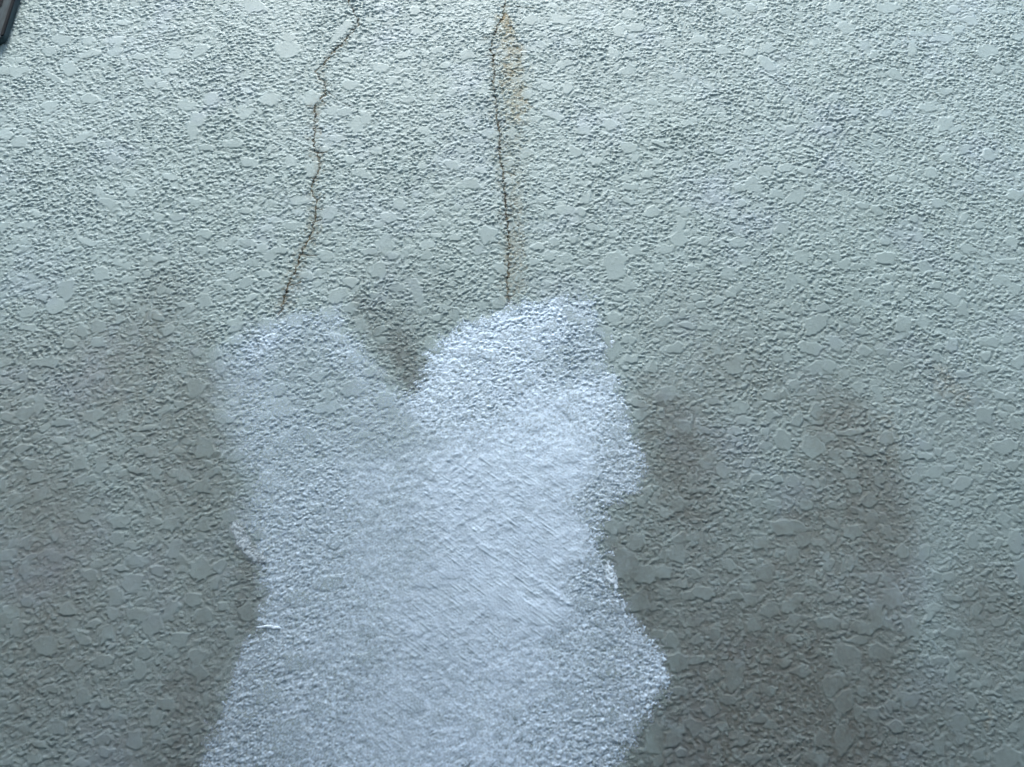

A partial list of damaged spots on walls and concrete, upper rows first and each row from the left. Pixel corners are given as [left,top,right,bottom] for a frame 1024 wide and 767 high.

crack [278,0,359,315]
crack [484,0,534,303]